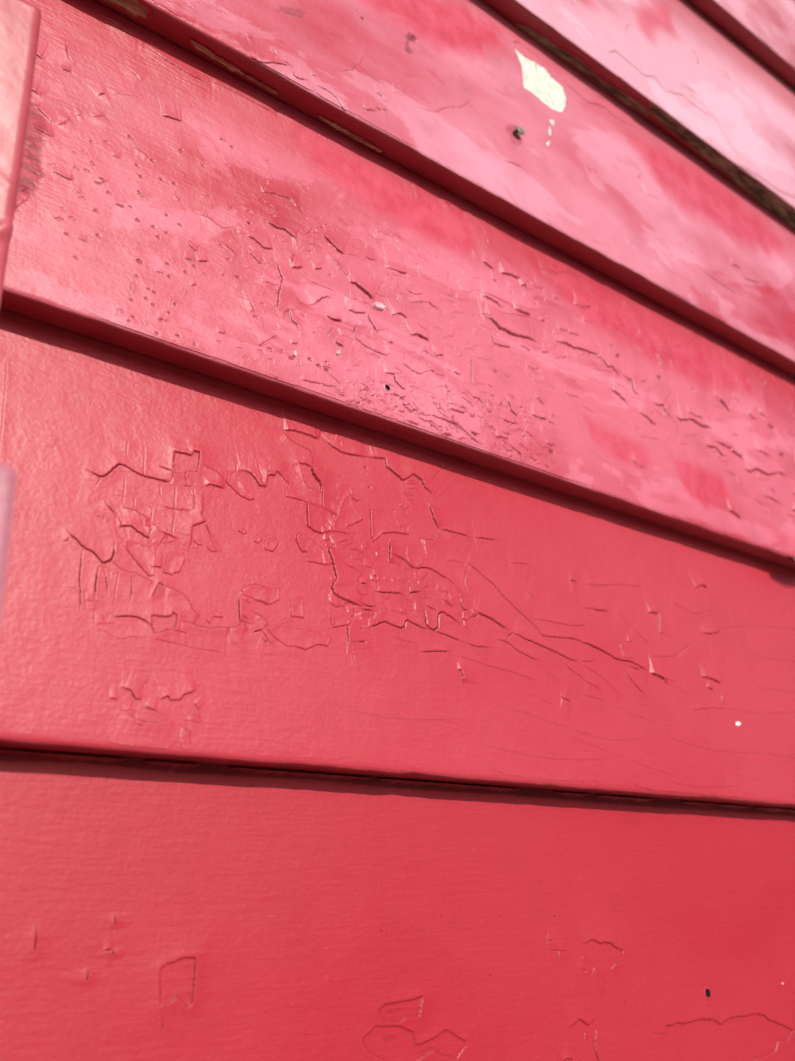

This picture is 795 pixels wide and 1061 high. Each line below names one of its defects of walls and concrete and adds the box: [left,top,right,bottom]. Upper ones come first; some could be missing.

spalling [10,0,795,521]
crack [653,303,746,379]
peeling [46,400,502,749]
crack [356,529,795,797]